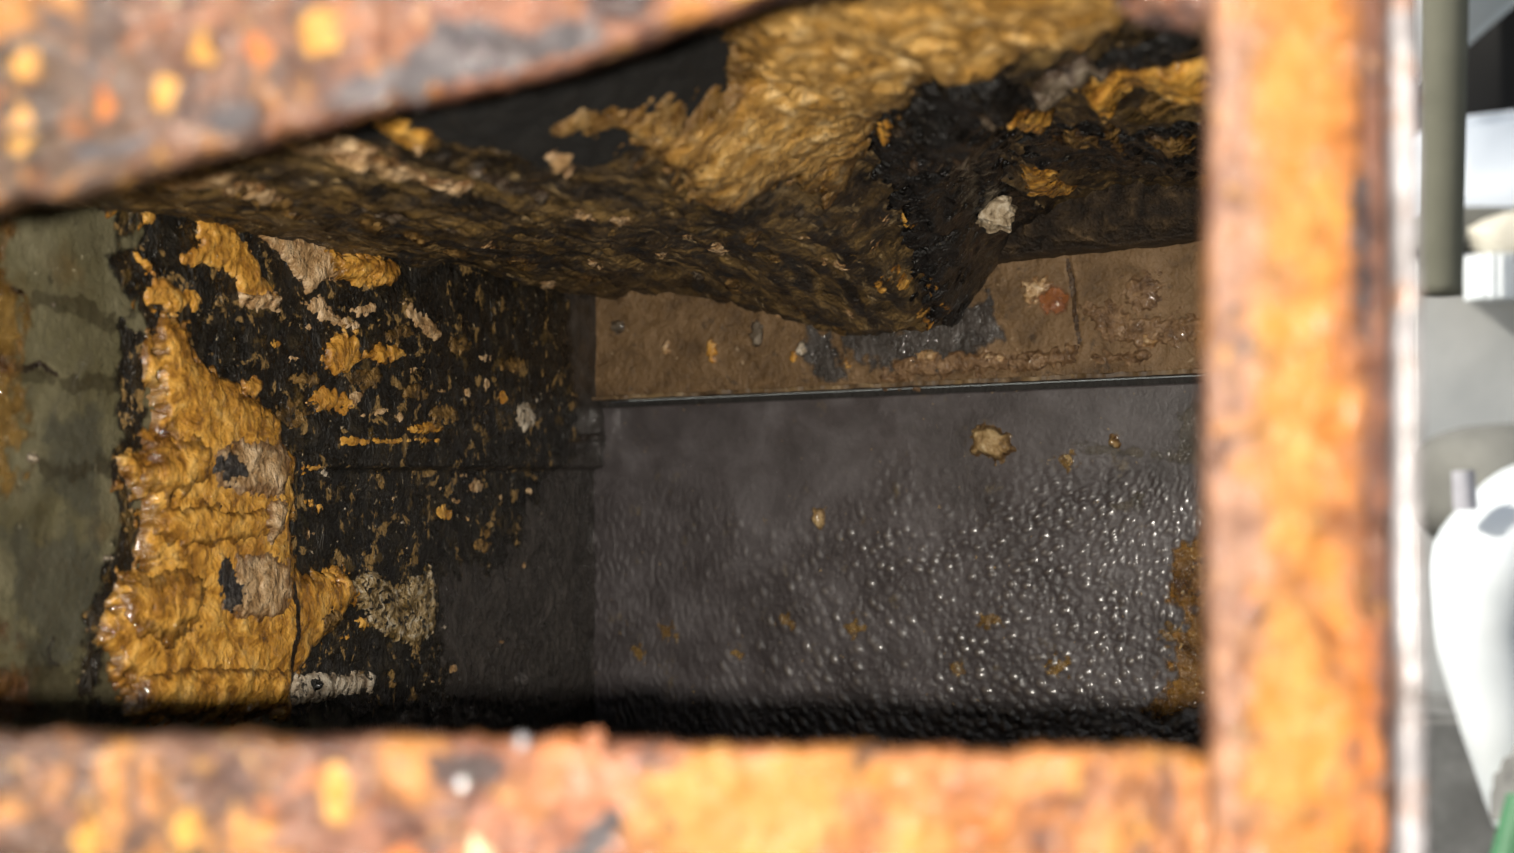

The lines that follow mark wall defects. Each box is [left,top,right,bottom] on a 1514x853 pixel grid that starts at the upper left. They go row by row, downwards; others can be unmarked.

corrosion [7,103,36,156]
corrosion [6,46,40,78]
corrosion [152,76,181,111]
corrosion [299,7,341,57]
spalling [284,0,652,205]
peeling [154,168,310,221]
peeling [131,252,202,318]
peeling [179,221,525,446]
peeling [425,473,492,554]
peeling [308,530,369,640]
corrosion [1139,532,1205,725]
corrosion [1353,622,1386,853]